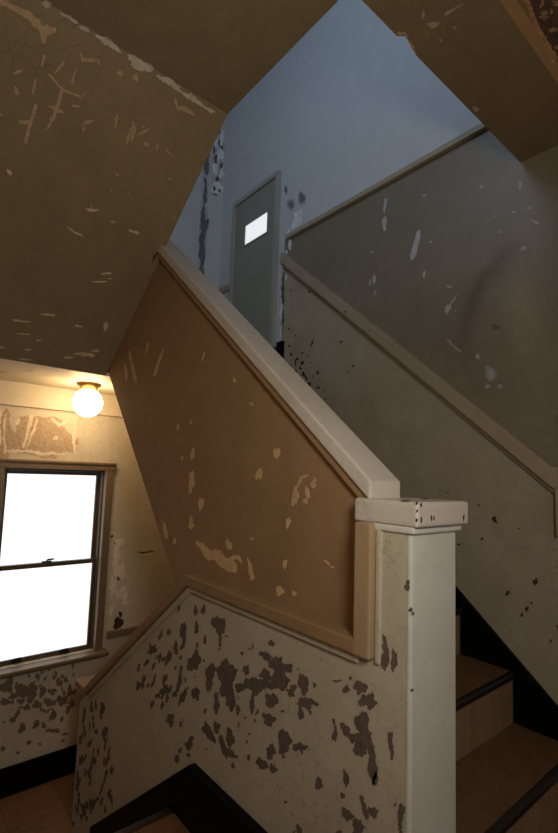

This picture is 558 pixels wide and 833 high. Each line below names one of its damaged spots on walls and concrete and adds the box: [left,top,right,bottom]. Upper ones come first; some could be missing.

peeling [60,13,216,116]
peeling [524,0,558,63]
peeling [279,272,326,400]
peeling [0,408,79,459]
peeling [108,535,130,630]
peeling [195,539,255,581]
peeling [0,664,114,827]
peeling [136,604,319,774]
peeling [331,676,379,787]
peeling [381,634,398,672]
peeling [340,769,379,833]
peeling [394,803,406,833]